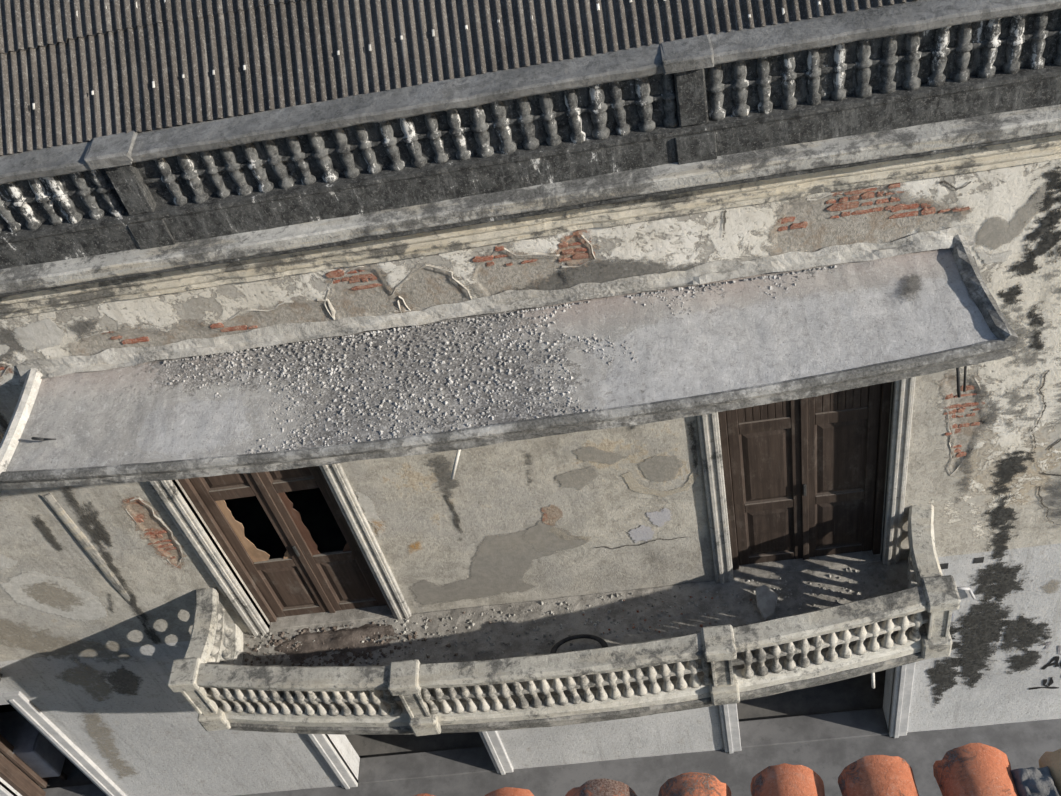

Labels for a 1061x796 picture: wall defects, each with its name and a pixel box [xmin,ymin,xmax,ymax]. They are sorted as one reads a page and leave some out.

flaking render [761,183,972,256]
water stain [32,515,62,551]
water stain [62,486,160,644]
flaking render [120,497,186,569]
flaking render [0,229,600,379]
spalling [162,301,638,454]
water stain [424,457,463,539]
peeling [556,446,627,490]
flaking render [933,371,992,477]
water stain [926,449,1061,706]
water stain [976,166,1061,432]
crack [1031,370,1061,523]